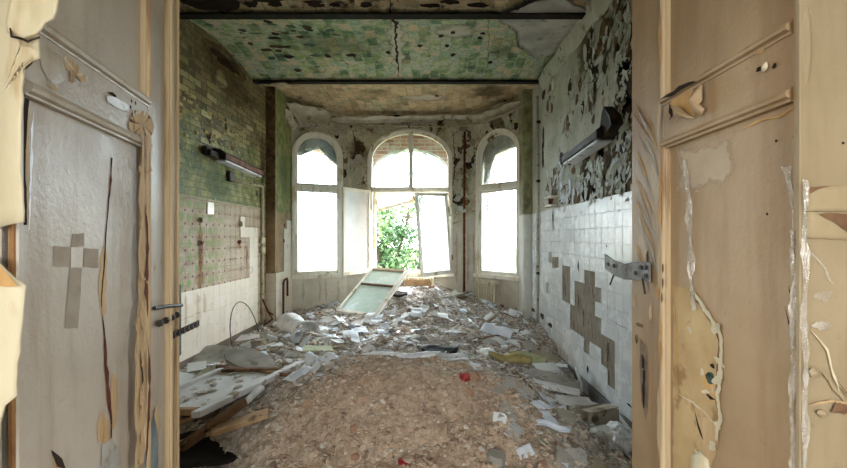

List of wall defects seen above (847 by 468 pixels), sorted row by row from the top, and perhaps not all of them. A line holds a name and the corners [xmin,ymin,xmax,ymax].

crack [386,0,406,76]
flaking render [495,0,591,58]
peeling [449,112,518,217]
peeling [542,0,632,213]
peeling [552,257,615,390]
peeling [635,243,725,468]